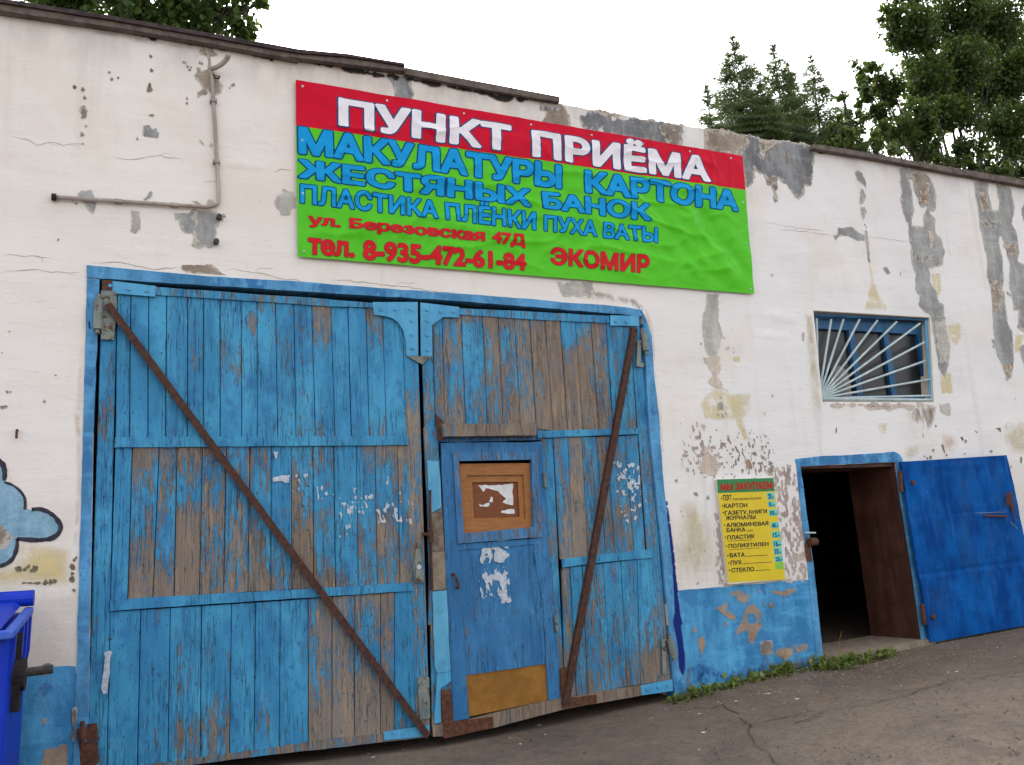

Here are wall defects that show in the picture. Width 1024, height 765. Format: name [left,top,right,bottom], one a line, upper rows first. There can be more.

peeling [182,47,235,105]
peeling [136,114,159,140]
peeling [174,199,226,249]
peeling [274,189,296,216]
peeling [540,102,684,145]
peeling [704,127,815,203]
peeling [833,170,870,262]
peeling [899,167,951,377]
peeling [974,181,1024,381]
peeling [675,293,808,660]